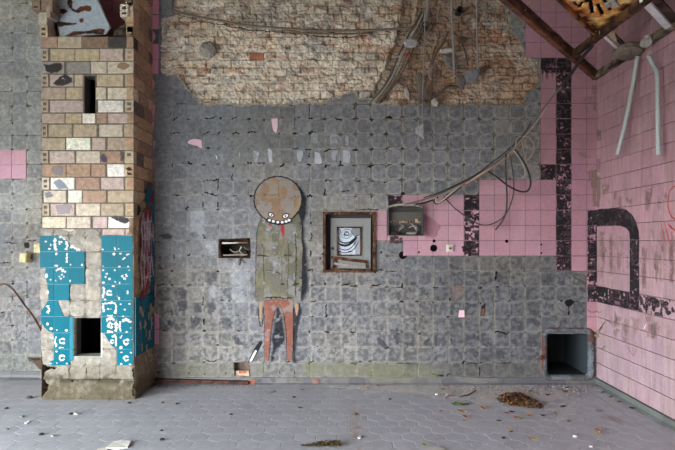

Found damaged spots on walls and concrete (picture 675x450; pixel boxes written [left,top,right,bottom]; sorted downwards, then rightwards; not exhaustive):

flaking render [160,0,541,108]
spalling [28,322,68,370]
peeling [45,236,81,282]
peeling [102,247,132,365]